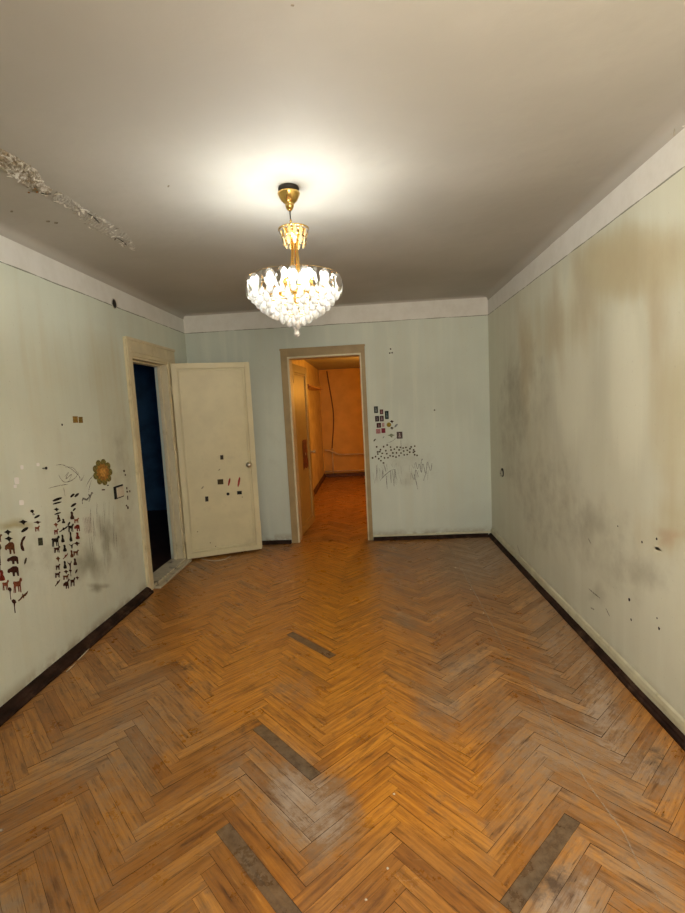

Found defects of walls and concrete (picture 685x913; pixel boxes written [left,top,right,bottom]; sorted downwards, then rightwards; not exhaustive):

peeling [0,148,136,251]
leakage [512,211,685,463]
leakage [650,523,685,553]